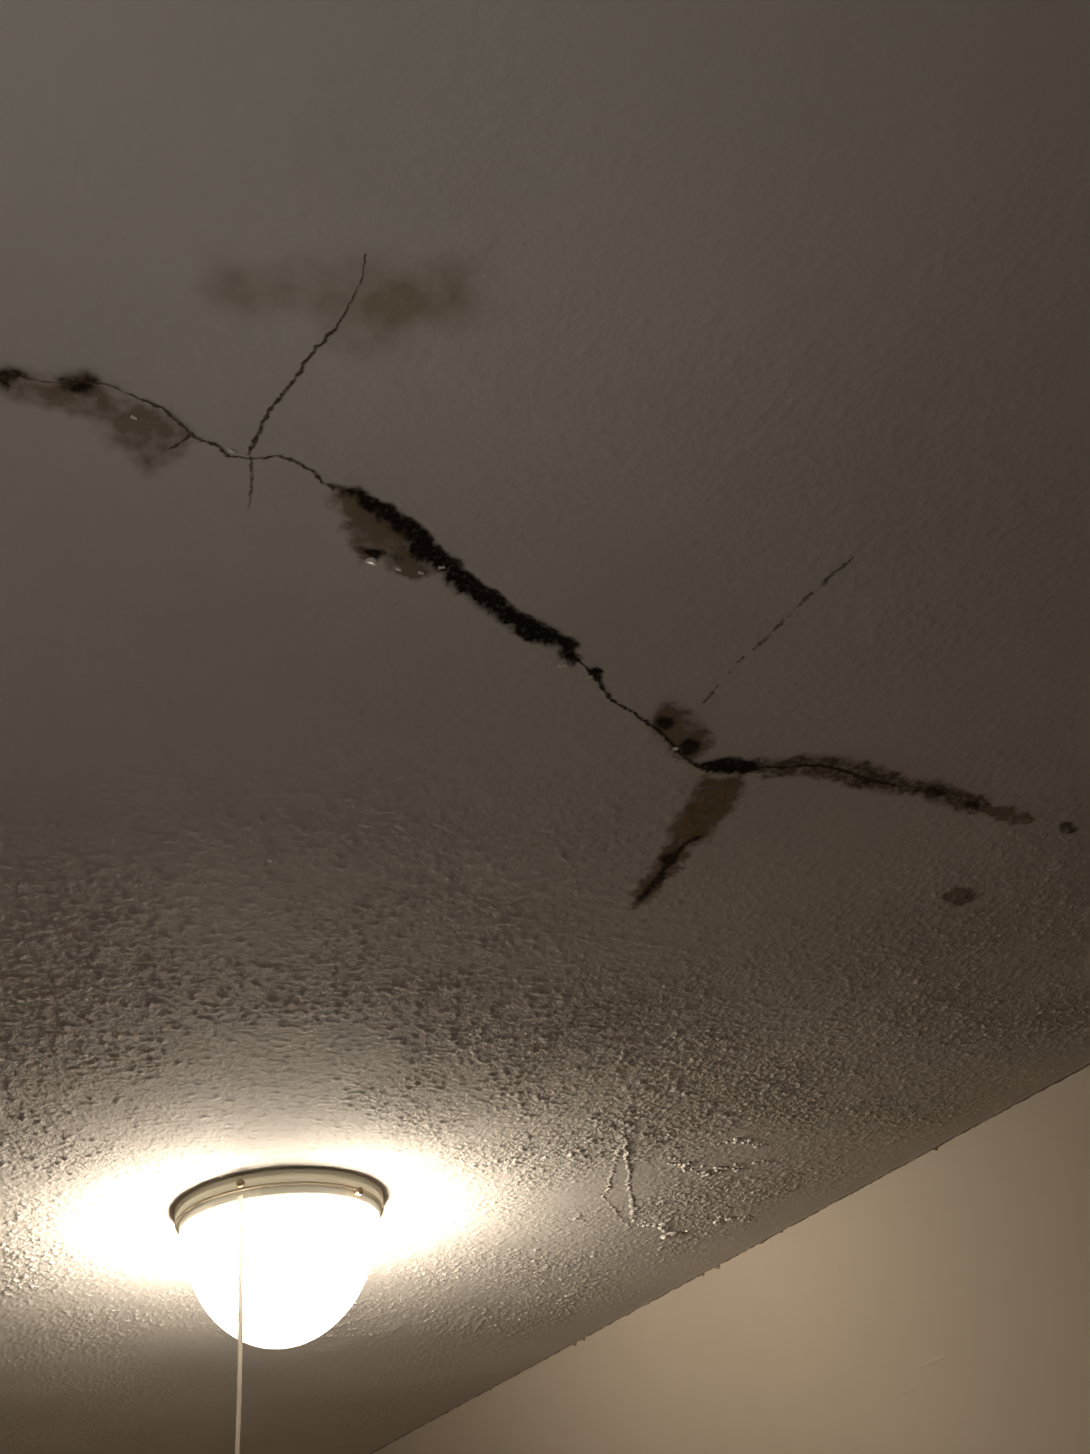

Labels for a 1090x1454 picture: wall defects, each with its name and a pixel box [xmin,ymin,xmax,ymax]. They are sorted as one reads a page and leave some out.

water stain [0,374,184,466]
crack [0,254,1076,833]
crack [630,835,703,909]